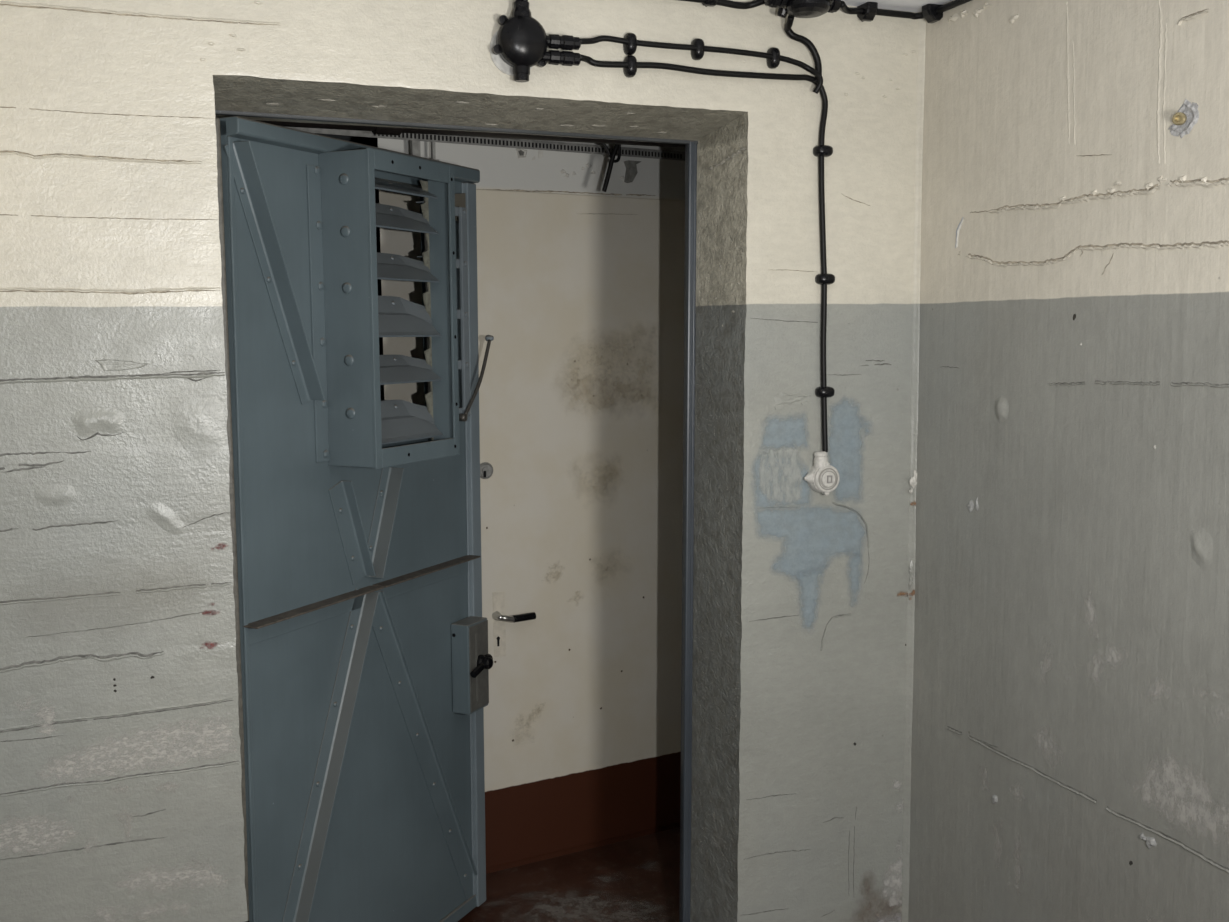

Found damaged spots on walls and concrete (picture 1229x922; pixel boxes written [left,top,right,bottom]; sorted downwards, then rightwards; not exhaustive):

crack [955,177,1229,273]
crack [947,726,1229,873]